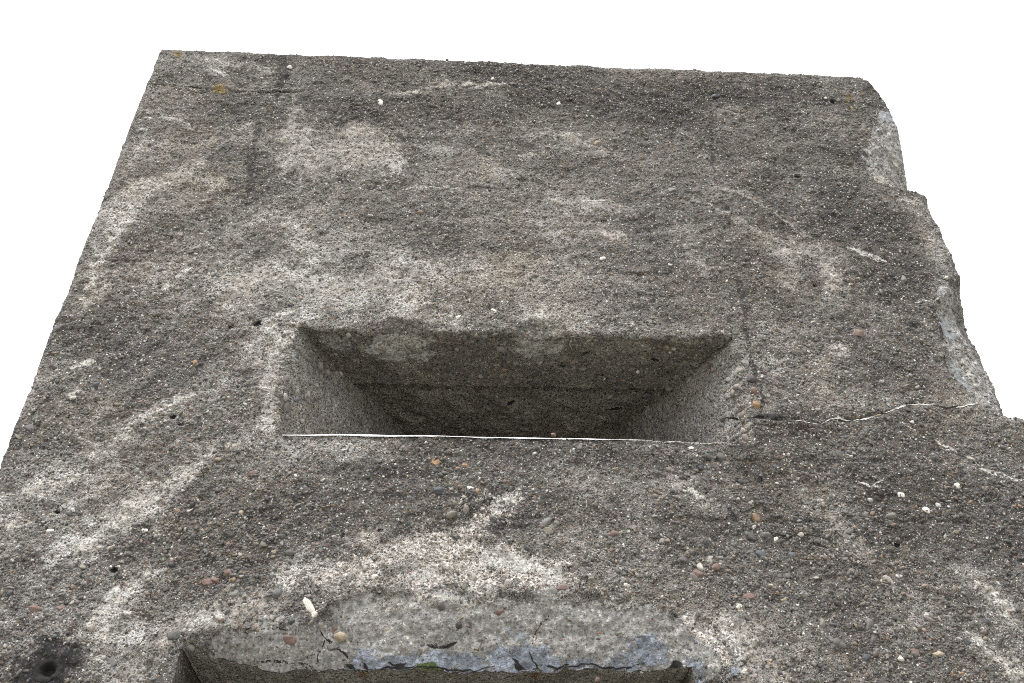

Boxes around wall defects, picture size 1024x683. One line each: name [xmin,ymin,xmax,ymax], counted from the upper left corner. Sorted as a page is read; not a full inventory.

crack [720,403,976,426]
spalling [65,642,171,683]
crack [248,615,644,672]